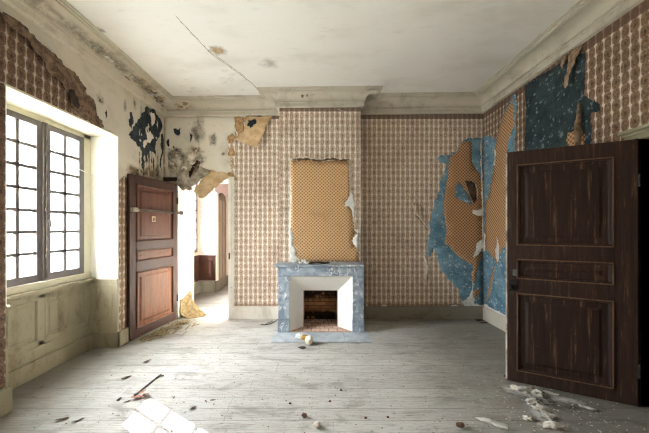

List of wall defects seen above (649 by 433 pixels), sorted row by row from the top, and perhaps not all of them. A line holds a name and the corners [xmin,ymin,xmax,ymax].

crack [176,16,258,90]
flaking render [105,56,246,184]
mould [130,130,203,177]
peeling [288,228,298,261]
peeling [345,191,359,252]
peeling [473,233,486,257]
peeling [451,283,506,317]